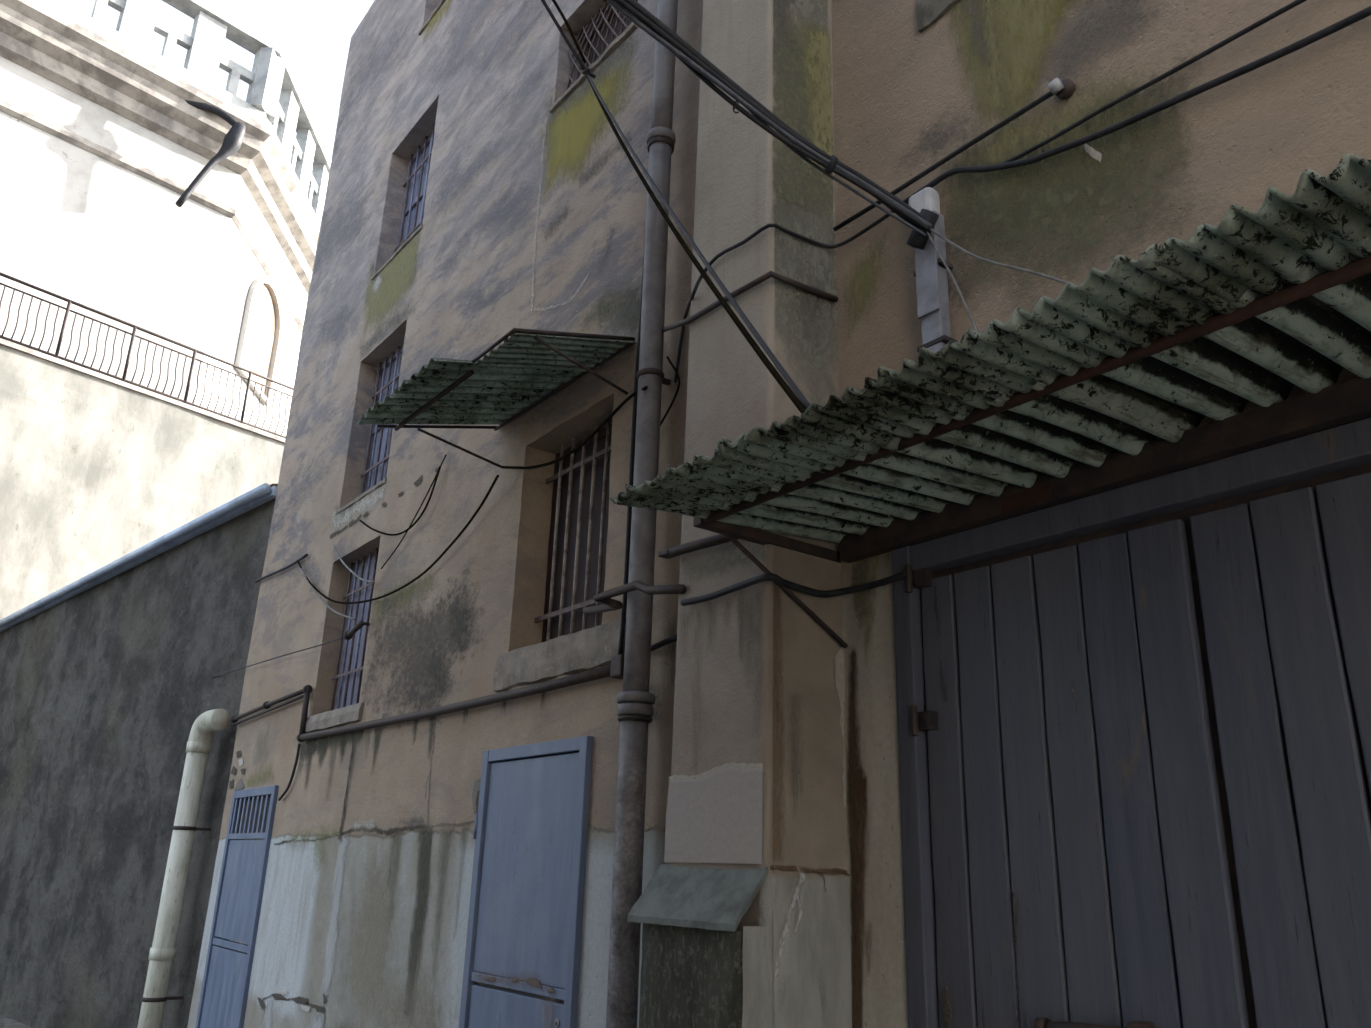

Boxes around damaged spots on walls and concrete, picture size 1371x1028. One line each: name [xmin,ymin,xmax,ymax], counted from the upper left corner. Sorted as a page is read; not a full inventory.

leakage [946,0,1186,297]
leakage [364,572,482,753]
leakage [299,728,381,787]
leakage [345,828,465,1028]
crack [770,865,849,979]